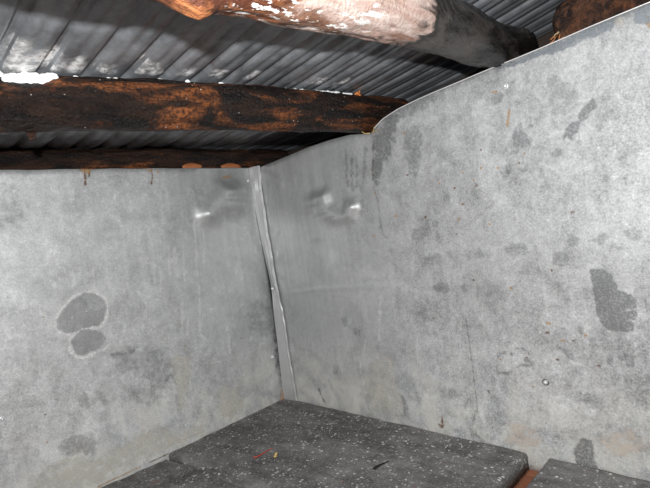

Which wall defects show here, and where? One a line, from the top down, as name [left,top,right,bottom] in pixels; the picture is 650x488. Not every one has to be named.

leakage [53,291,111,359]
leakage [590,269,636,331]